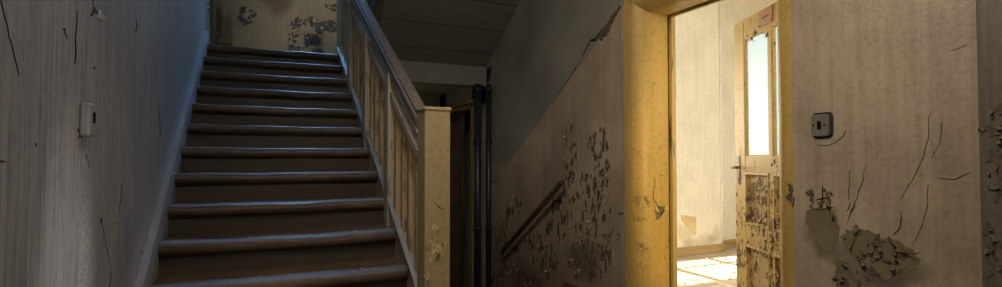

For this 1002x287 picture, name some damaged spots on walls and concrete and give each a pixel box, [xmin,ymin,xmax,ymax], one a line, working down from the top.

crack [0,0,19,75]
crack [63,0,94,63]
peeling [287,3,337,53]
crack [889,114,971,262]
flaking render [736,177,920,287]